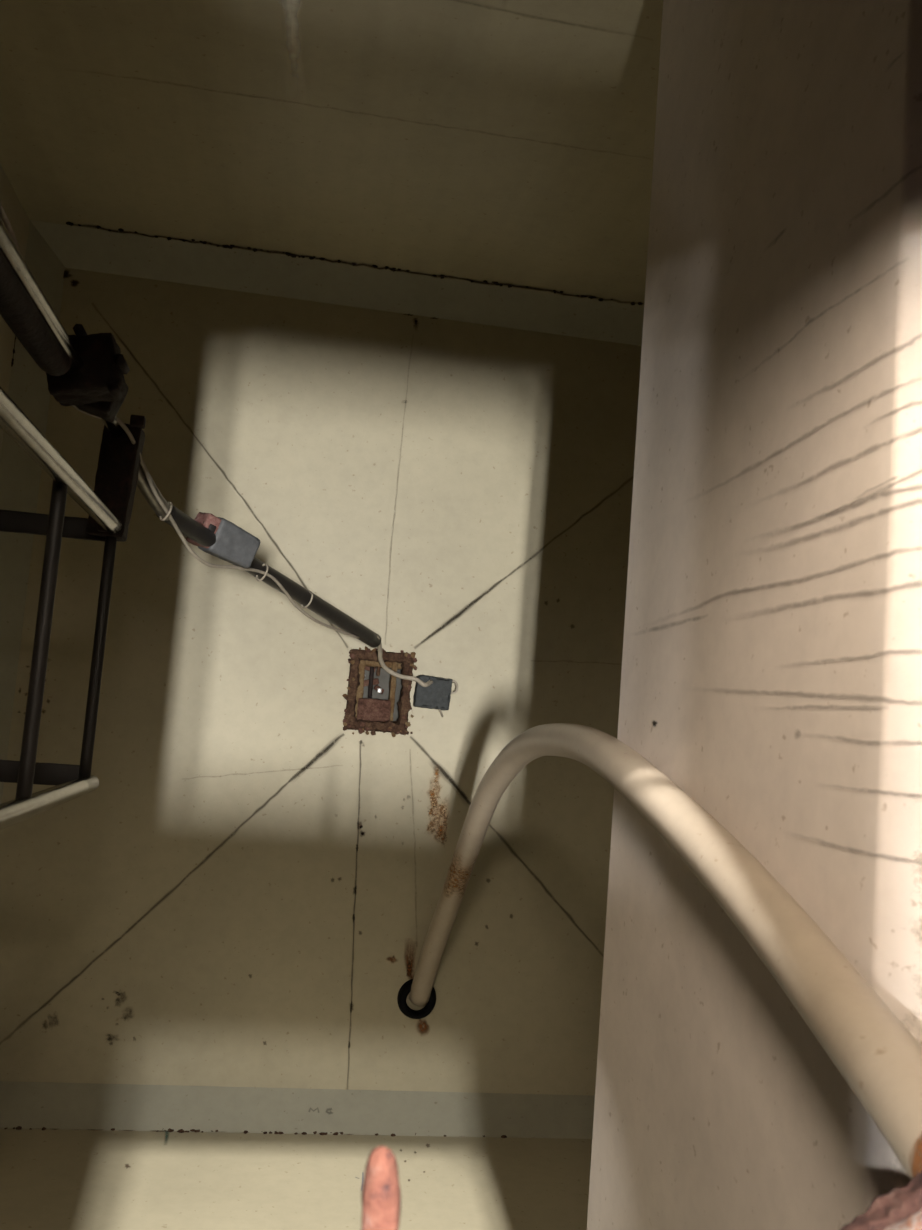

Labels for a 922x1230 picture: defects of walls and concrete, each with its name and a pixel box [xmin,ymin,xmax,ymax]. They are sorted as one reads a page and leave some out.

corrosion [428,770,447,843]